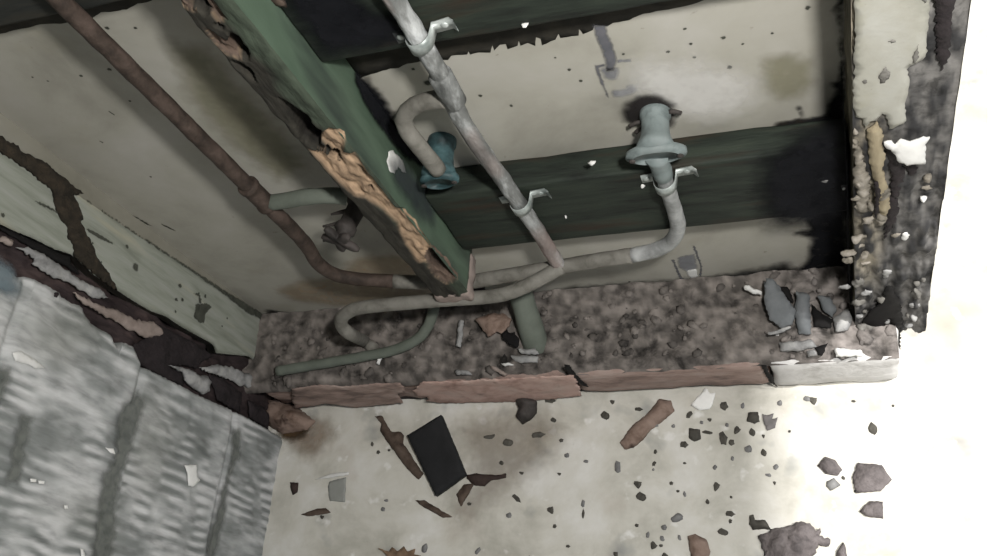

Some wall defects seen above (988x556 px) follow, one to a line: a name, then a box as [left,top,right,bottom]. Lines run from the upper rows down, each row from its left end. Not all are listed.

peeling [434,0,703,60]
peeling [346,47,420,78]
peeling [840,0,956,265]
peeling [0,236,163,338]
peeling [838,278,885,330]
peeling [904,278,926,328]
peeling [168,364,253,394]